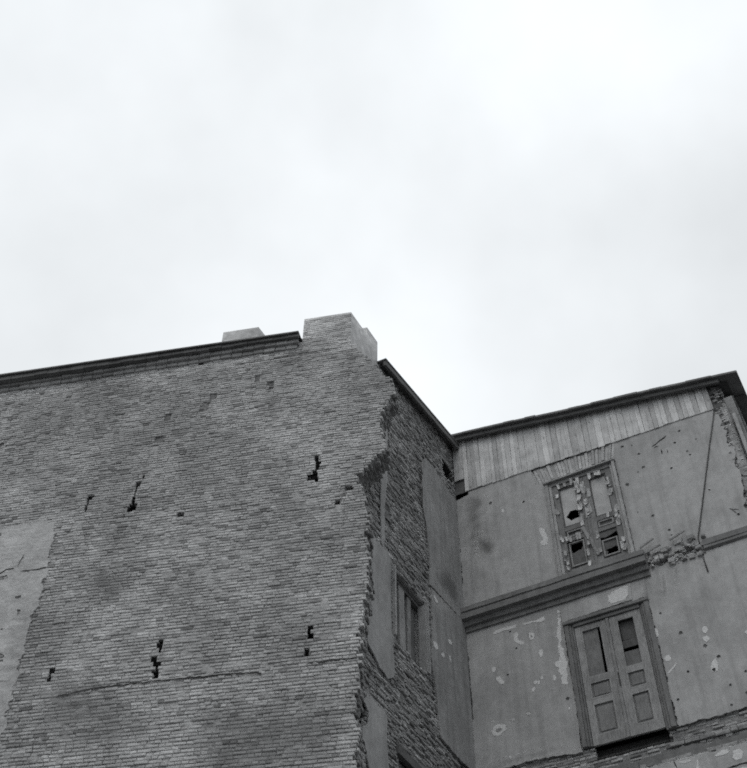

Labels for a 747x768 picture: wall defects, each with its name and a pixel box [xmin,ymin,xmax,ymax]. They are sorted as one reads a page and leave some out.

spalling [308,458,321,482]
peeling [608,586,628,605]
peeling [0,520,57,747]
spalling [151,642,163,679]
peeling [493,616,545,649]
peeling [553,610,568,685]